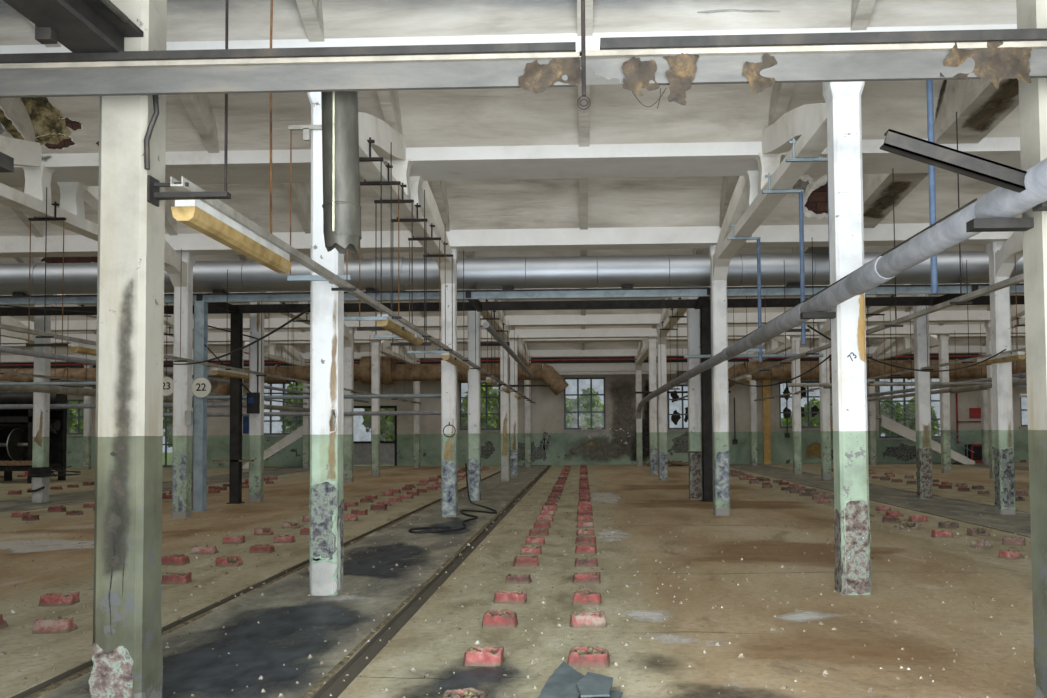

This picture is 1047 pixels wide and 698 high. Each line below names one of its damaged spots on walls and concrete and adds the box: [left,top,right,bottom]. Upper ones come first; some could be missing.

flaking render [0,97,83,150]
flaking render [787,174,828,219]
flaking render [992,447,1016,510]
flaking render [308,480,344,596]
flaking render [834,498,872,595]
spalling [88,643,134,698]